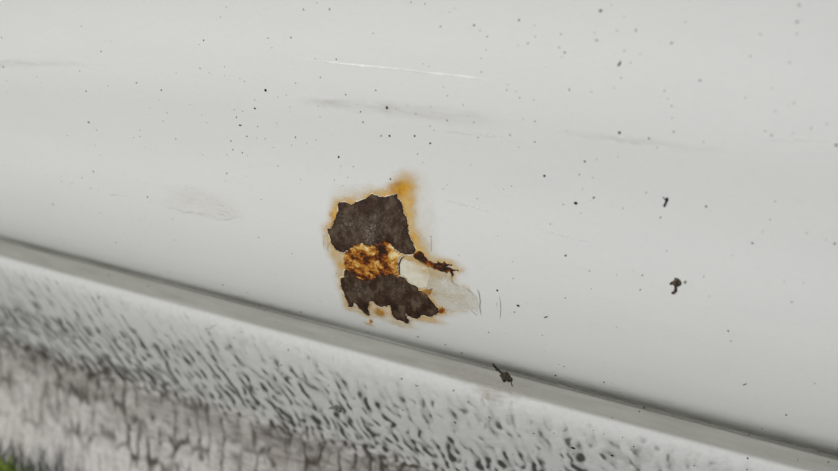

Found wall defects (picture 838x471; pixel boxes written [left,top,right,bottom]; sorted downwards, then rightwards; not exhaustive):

rust [326,178,481,325]